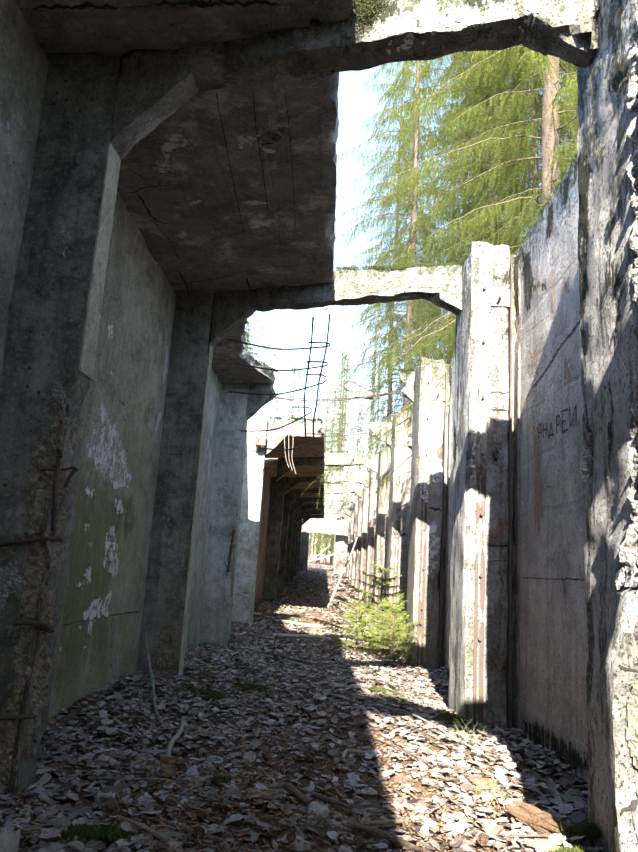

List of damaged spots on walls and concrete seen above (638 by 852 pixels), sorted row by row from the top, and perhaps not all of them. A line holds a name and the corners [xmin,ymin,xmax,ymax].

crack [32,0,280,14]
peeling [384,0,485,55]
spalling [626,30,638,351]
spalling [0,379,133,796]
spalling [615,392,638,590]
spalling [621,799,638,841]